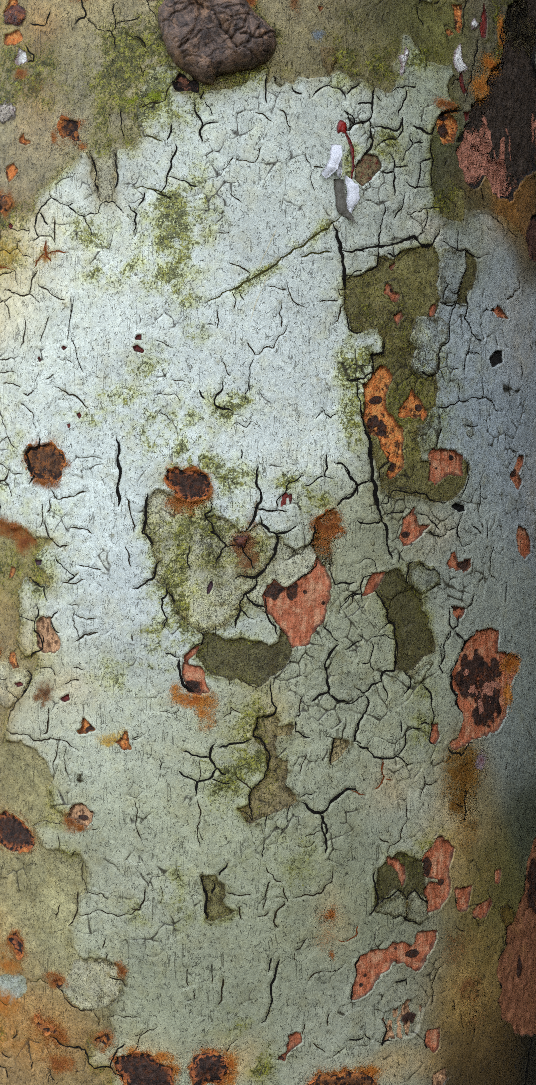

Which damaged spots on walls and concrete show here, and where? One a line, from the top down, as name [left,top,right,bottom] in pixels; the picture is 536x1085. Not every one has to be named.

crack [158,0,535,450]
peeling [343,246,477,546]
rust [24,441,70,488]
rust [166,493,212,514]
peeling [144,466,345,695]
peeling [362,551,471,683]
crack [35,340,507,1033]
peeling [430,628,520,750]
peeling [352,836,536,1042]
crack [30,978,157,1083]
rust [225,1053,238,1085]
crack [302,1013,391,1052]